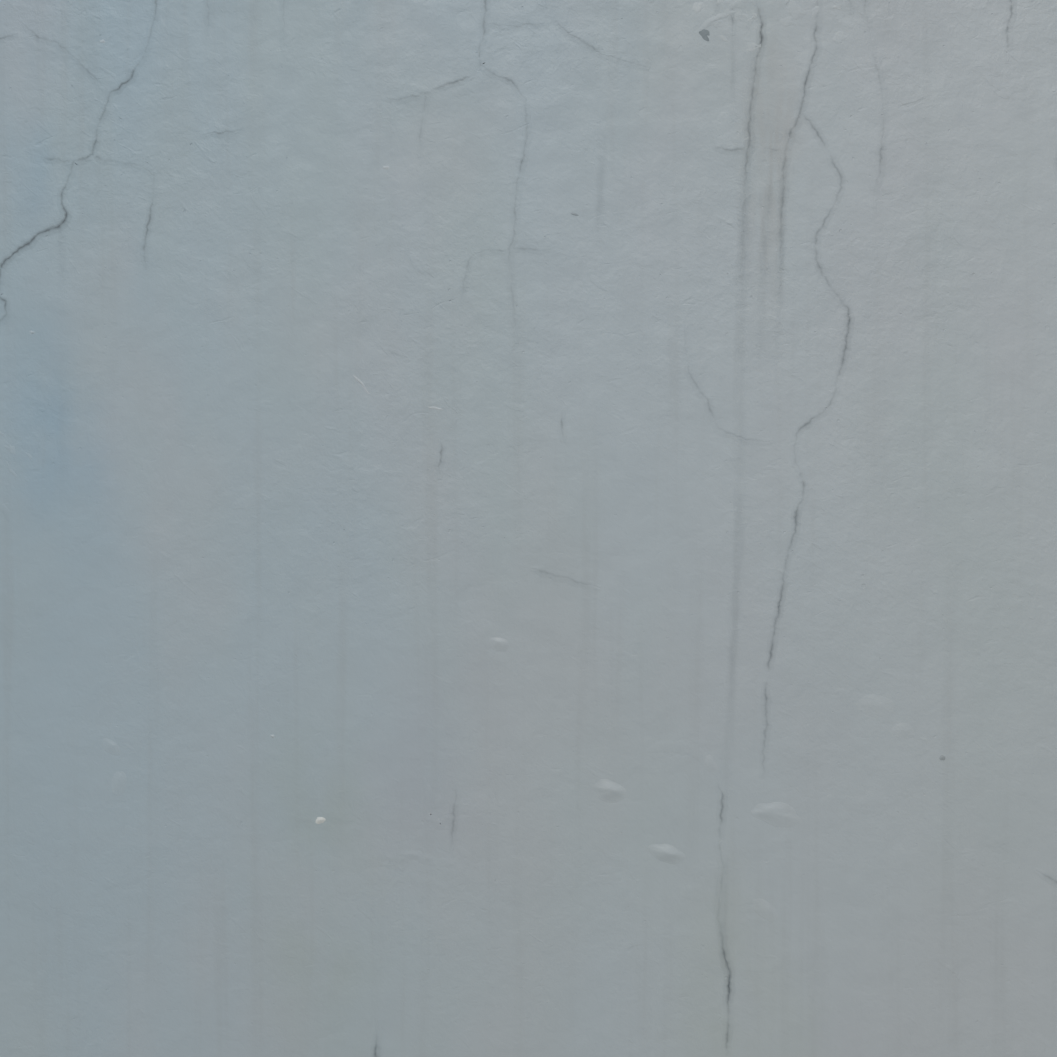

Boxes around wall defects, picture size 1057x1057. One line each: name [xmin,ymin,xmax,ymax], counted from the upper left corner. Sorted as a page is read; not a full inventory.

crack [0,0,161,327]
crack [709,0,855,787]
crack [712,781,736,1057]